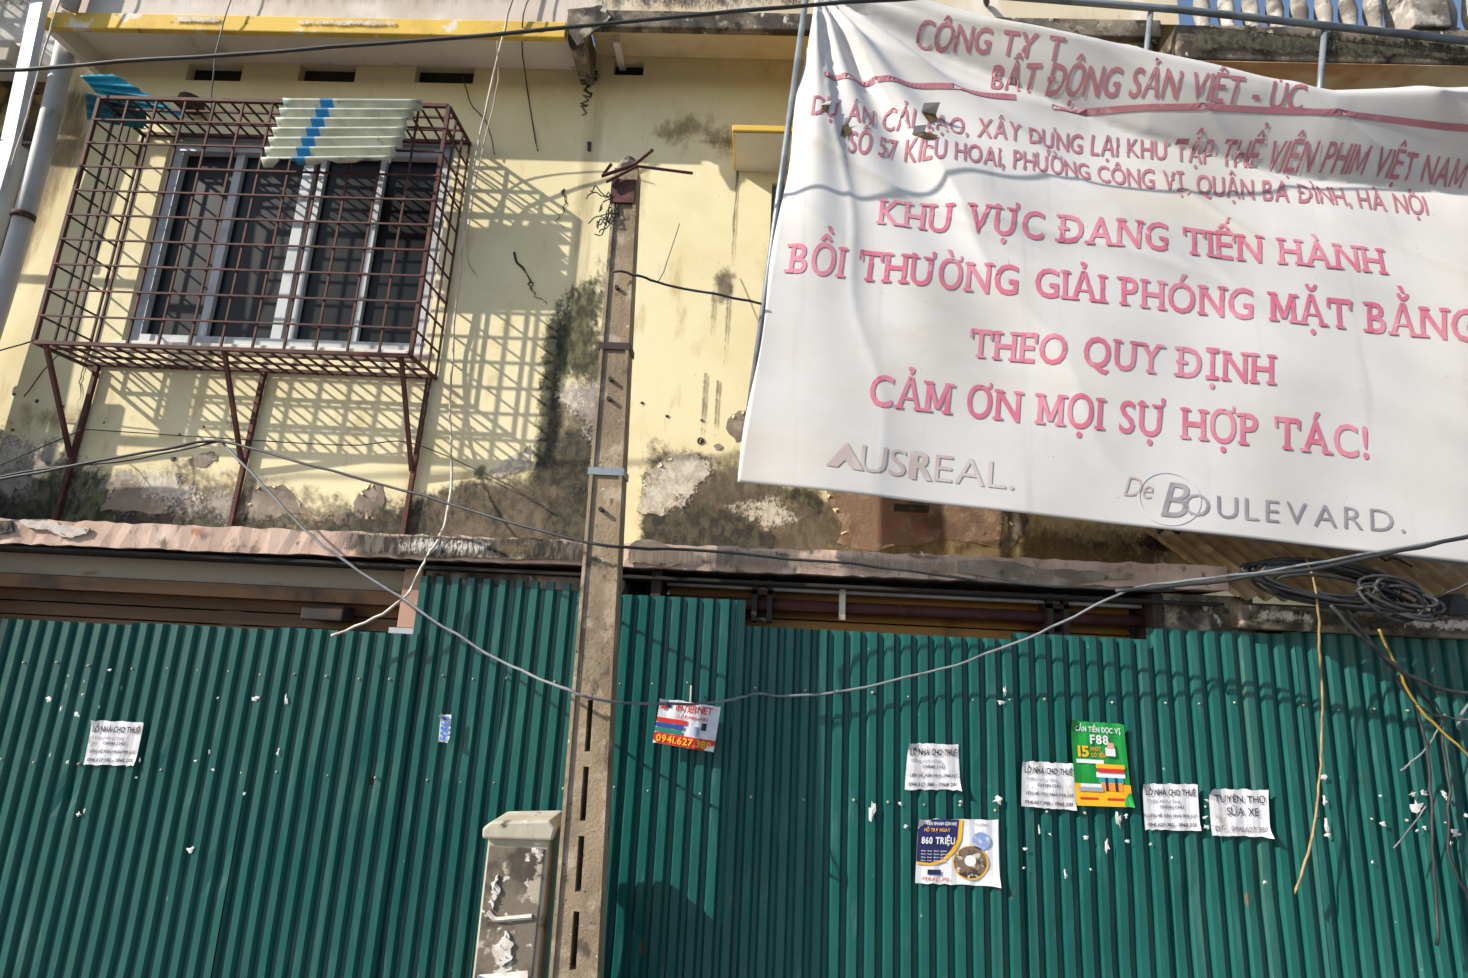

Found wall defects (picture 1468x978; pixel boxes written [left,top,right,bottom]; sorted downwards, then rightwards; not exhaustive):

leakage [0,260,606,561]
peeling [636,410,746,516]
peeling [628,539,705,568]